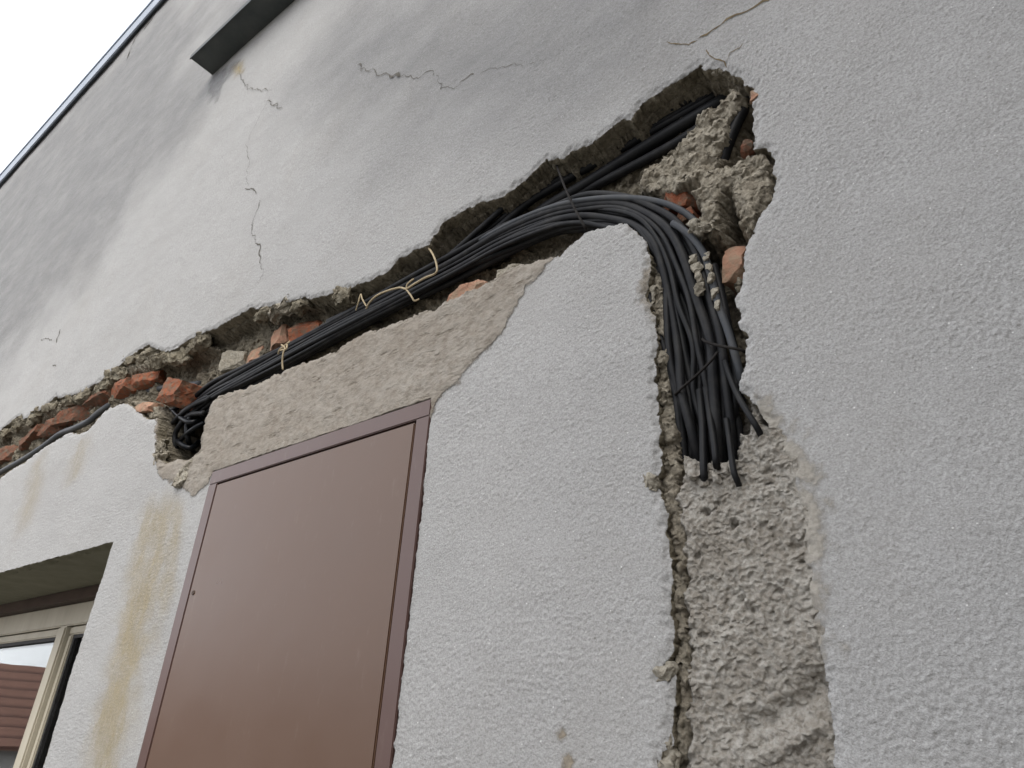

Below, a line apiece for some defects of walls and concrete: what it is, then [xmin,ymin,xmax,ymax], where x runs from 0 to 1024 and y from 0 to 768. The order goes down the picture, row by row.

flaking render [0,69,776,496]
crack [358,62,536,89]
crack [667,0,769,68]
flaking render [643,271,740,768]